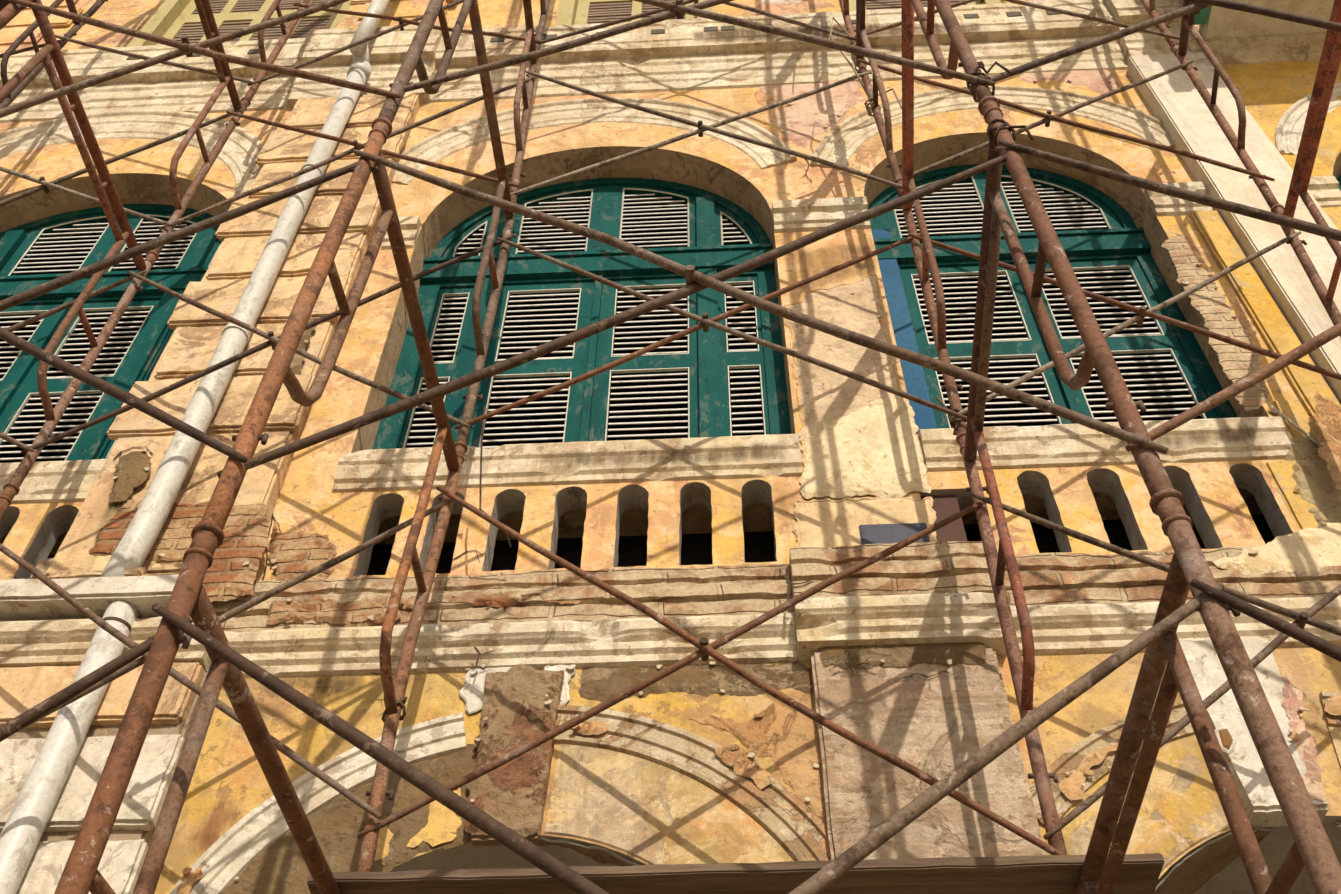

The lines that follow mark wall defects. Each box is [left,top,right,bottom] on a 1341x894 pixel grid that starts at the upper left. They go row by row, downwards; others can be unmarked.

spalling [1162,234,1270,411]
spalling [1311,391,1341,491]
spalling [89,447,152,556]
spalling [145,502,209,567]
spalling [202,503,337,602]
spalling [544,642,986,821]
peeling [1281,669,1341,801]